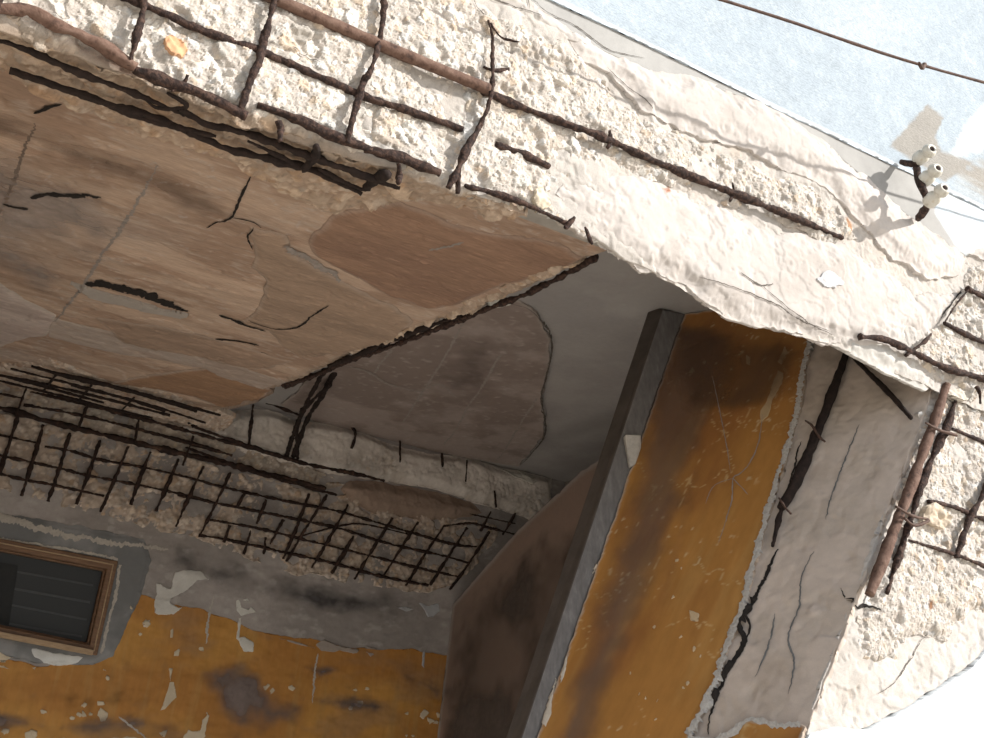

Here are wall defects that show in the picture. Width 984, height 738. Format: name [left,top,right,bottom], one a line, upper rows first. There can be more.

crack [474,0,653,108]
crack [3,192,101,210]
crack [207,177,261,249]
crack [85,280,188,312]
crack [215,306,328,346]
spalling [0,0,857,617]
spalling [856,263,984,662]
peeling [32,648,83,670]
peeling [138,570,209,636]
peeling [236,598,255,652]
peeling [542,655,568,727]
crack [707,549,814,734]